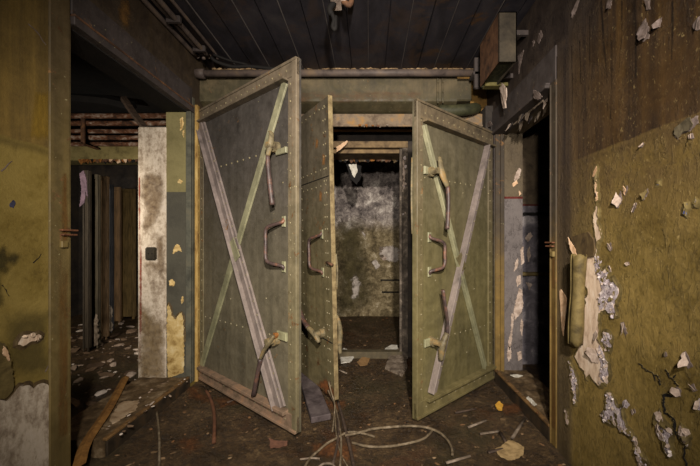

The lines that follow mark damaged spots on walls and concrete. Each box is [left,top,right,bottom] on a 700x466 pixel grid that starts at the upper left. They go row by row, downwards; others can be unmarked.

peeling [636,0,662,42]
leakage [143,175,162,228]
peeling [166,296,186,377]
leakage [341,227,367,309]
peeling [507,232,532,361]
peeling [559,164,651,466]
flaking render [0,330,55,466]
crack [639,363,688,466]
peeling [652,408,693,460]